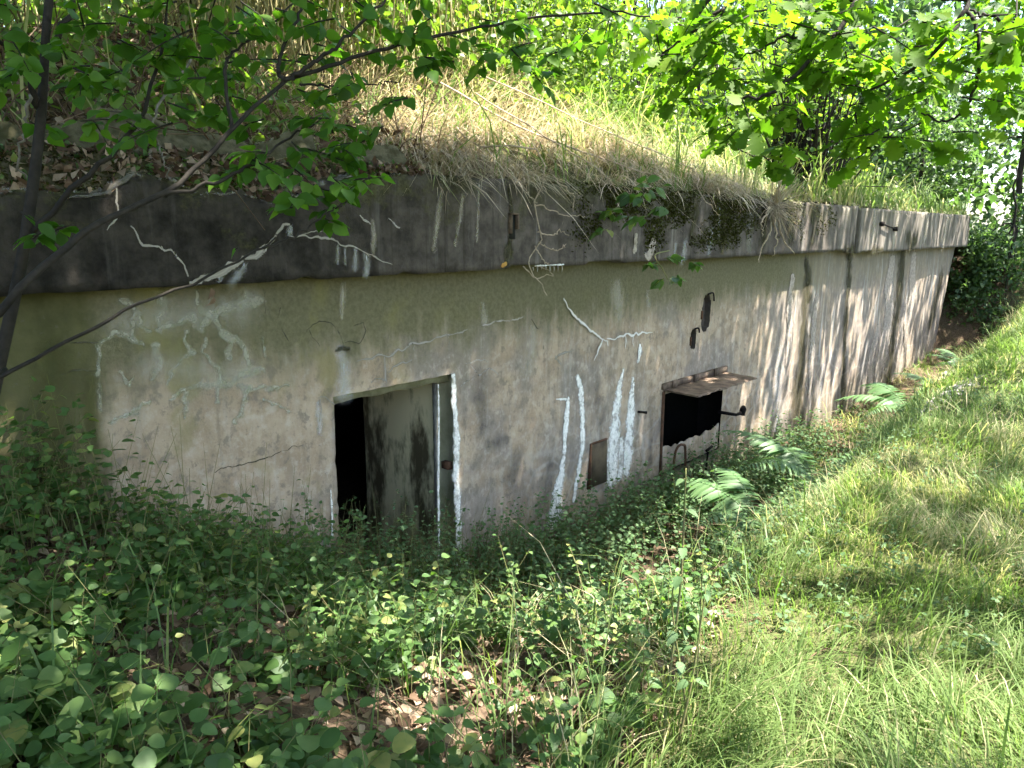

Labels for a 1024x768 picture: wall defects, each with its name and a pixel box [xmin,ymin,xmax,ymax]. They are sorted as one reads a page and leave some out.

crack [107,188,391,284]
crack [264,291,653,387]
crack [215,446,297,473]
efflorescence [547,375,585,529]
efflorescence [607,369,635,488]